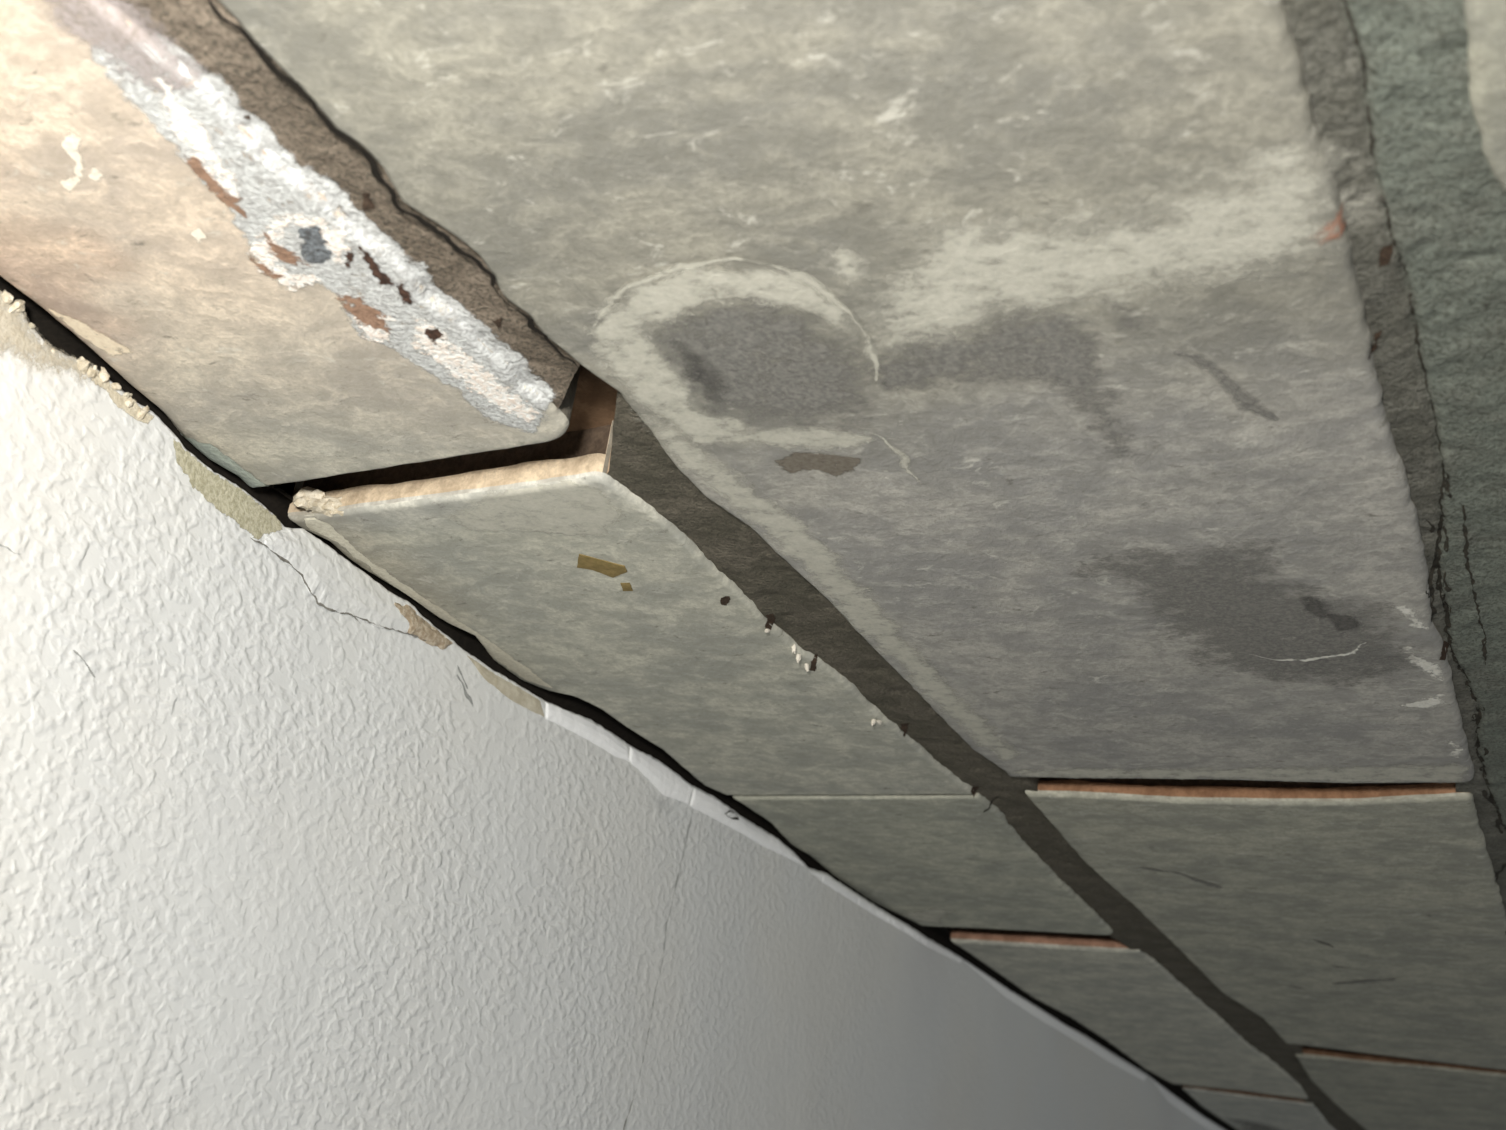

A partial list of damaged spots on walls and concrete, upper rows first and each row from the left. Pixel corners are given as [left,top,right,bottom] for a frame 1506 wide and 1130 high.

peeling [60,133,104,192]
peeling [190,228,207,243]
spalling [362,193,375,210]
flaking render [0,290,154,424]
water stain [592,145,1470,783]
crack [1343,0,1506,882]
peeling [173,440,453,650]
peeling [577,554,633,591]
spalling [765,613,776,630]
peeling [468,656,1222,1130]